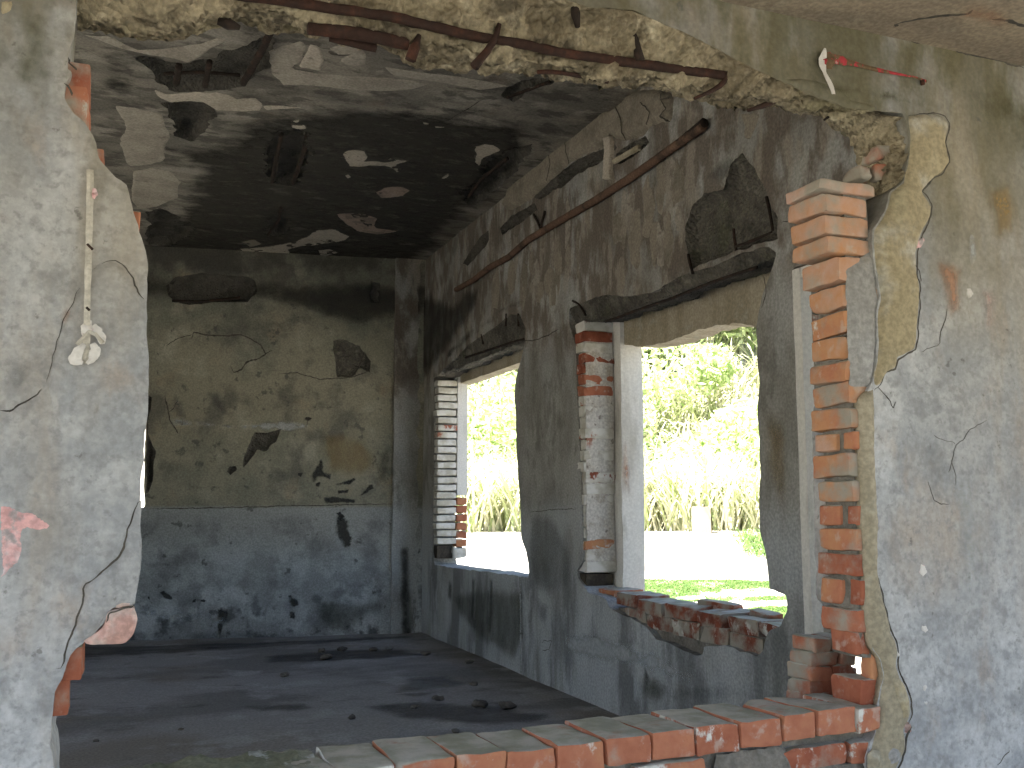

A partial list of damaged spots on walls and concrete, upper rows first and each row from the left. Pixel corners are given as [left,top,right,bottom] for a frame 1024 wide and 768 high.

spalling [77,0,898,246]
crack [0,260,144,412]
peeling [49,261,156,503]
spalling [167,273,257,305]
spalling [227,429,281,475]
peeling [241,213,396,255]
spalling [570,153,778,324]
crack [928,420,987,505]
peeling [1,506,49,577]
peeling [71,522,142,646]
crack [57,501,379,669]
peeling [853,390,911,768]